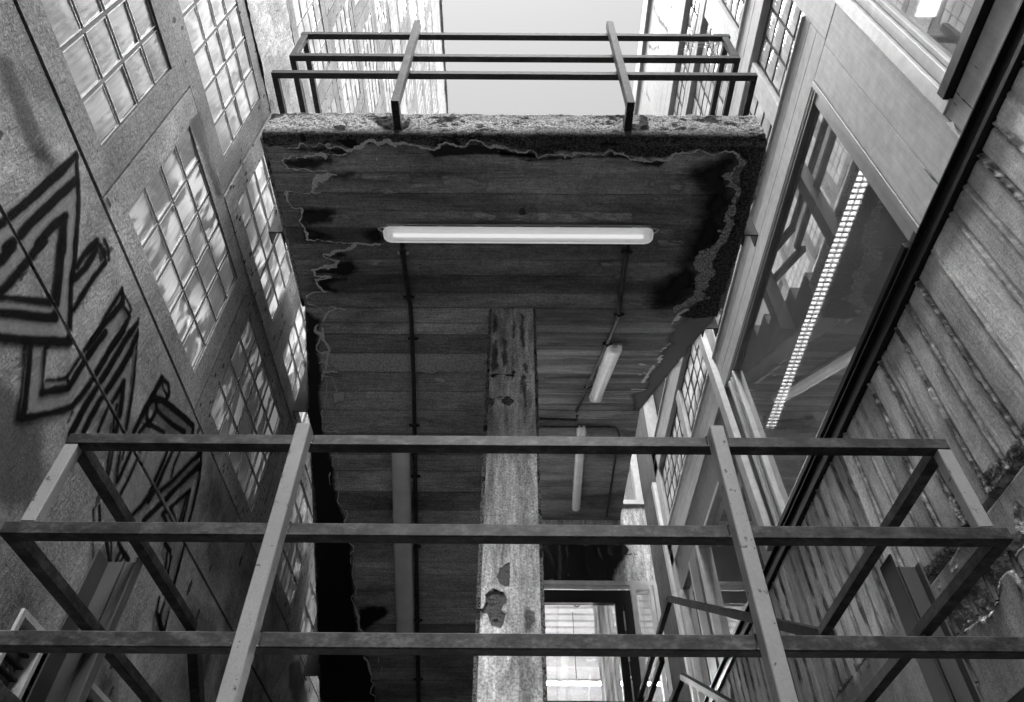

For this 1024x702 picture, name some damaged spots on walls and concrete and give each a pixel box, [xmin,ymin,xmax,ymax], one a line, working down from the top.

leakage [281,138,746,435]
leakage [310,452,349,523]
leakage [314,543,388,633]
spalling [477,562,510,628]
leakage [525,610,534,629]
leakage [289,655,383,702]